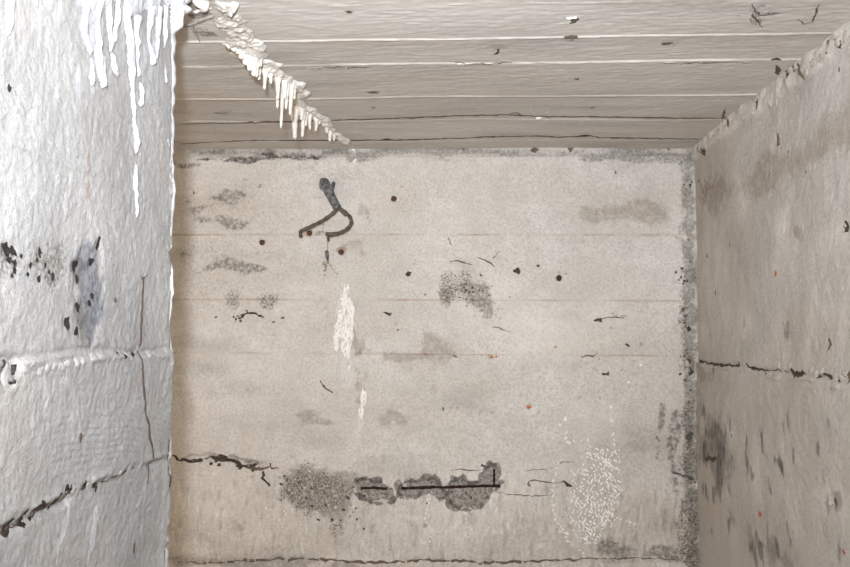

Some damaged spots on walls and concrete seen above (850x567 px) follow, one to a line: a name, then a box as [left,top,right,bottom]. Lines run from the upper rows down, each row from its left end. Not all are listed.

leakage [75,0,218,252]
leakage [195,0,357,164]
crack [137,270,278,487]
leakage [333,283,357,390]
leakage [440,266,493,307]
crack [699,360,848,382]
spalling [353,461,504,512]
leakage [551,416,636,558]